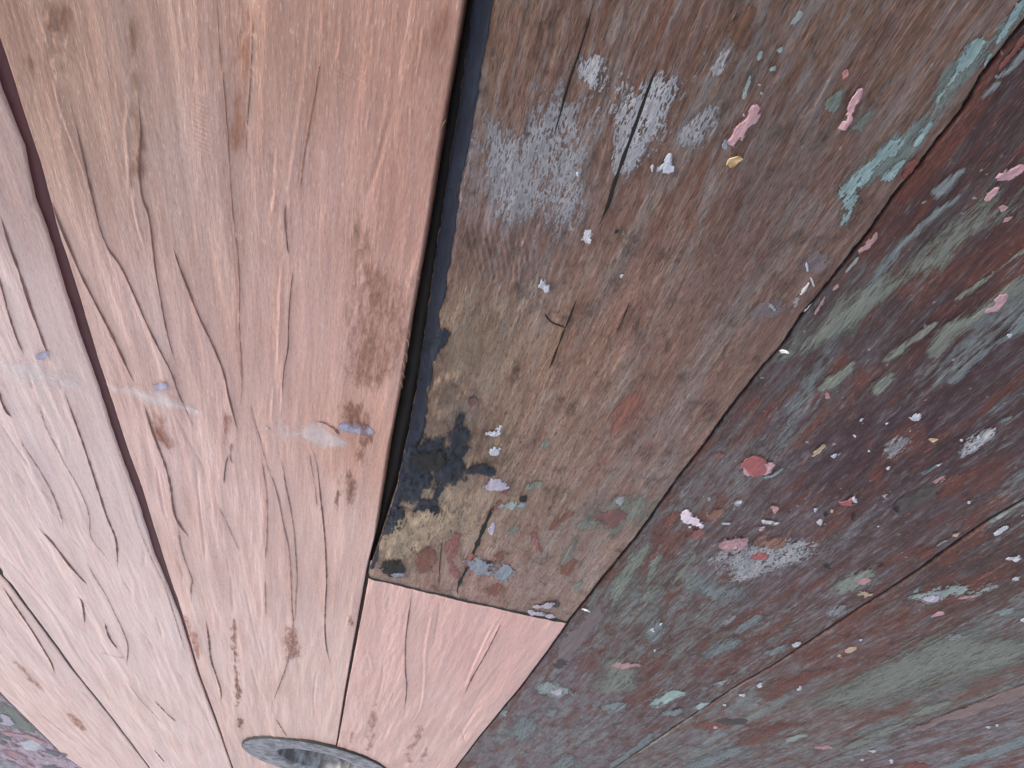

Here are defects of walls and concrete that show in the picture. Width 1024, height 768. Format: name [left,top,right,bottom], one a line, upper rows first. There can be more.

crack [599,63,659,225]
peeling [650,153,675,174]
peeling [722,75,763,168]
peeling [838,0,1024,227]
crack [0,201,222,723]
crack [69,6,298,737]
crack [308,422,340,664]
damp [357,271,393,381]
damp [370,0,493,569]
peeling [666,497,831,584]
peeling [958,416,1013,458]
crack [404,597,412,710]